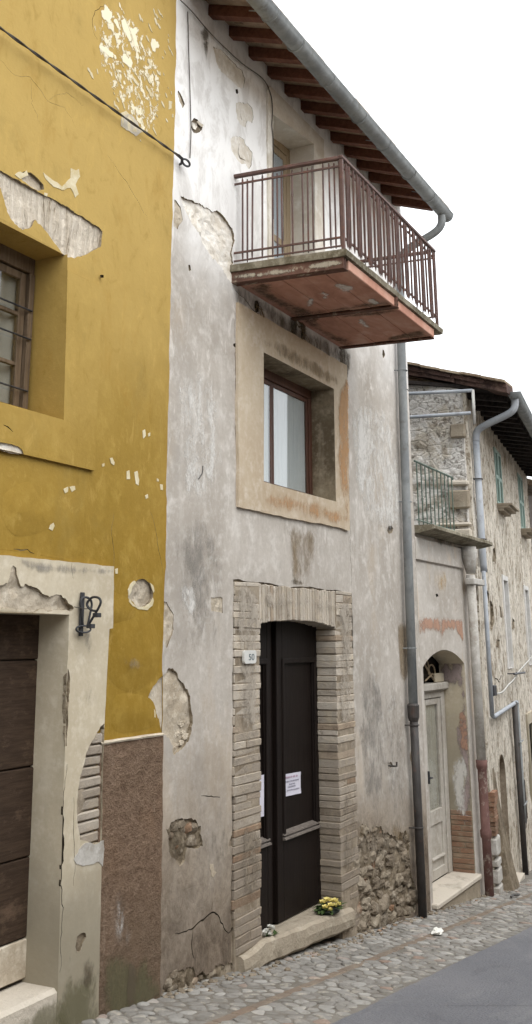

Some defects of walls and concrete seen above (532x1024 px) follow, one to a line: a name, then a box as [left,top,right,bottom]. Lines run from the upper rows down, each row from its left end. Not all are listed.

peeling [87,2,185,142]
flaking render [230,102,253,169]
flaking render [0,168,102,258]
flaking render [174,196,235,282]
flaking render [0,566,74,612]
flaking render [128,579,174,648]
flaking render [148,668,193,755]
flaking render [77,724,104,844]
flaking render [166,818,203,866]
crack [175,903,233,957]